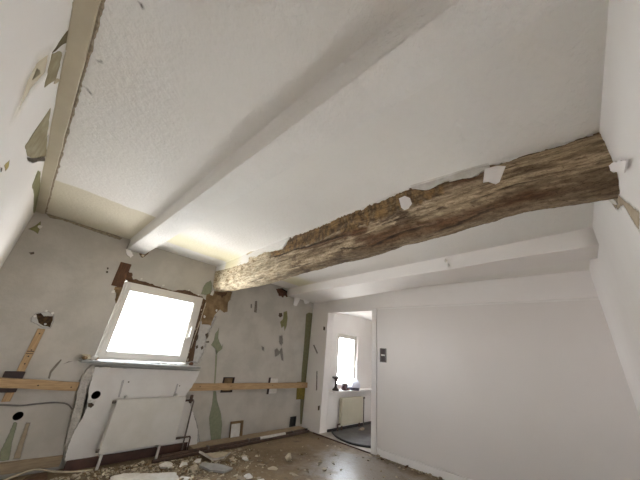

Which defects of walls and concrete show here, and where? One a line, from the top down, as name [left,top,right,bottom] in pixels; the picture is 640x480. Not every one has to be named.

peeling [609,160,629,173]
flaking render [216,163,506,271]
peeling [609,195,639,228]
spalling [276,289,310,306]
spalling [31,310,54,328]
flaking render [112,276,232,362]